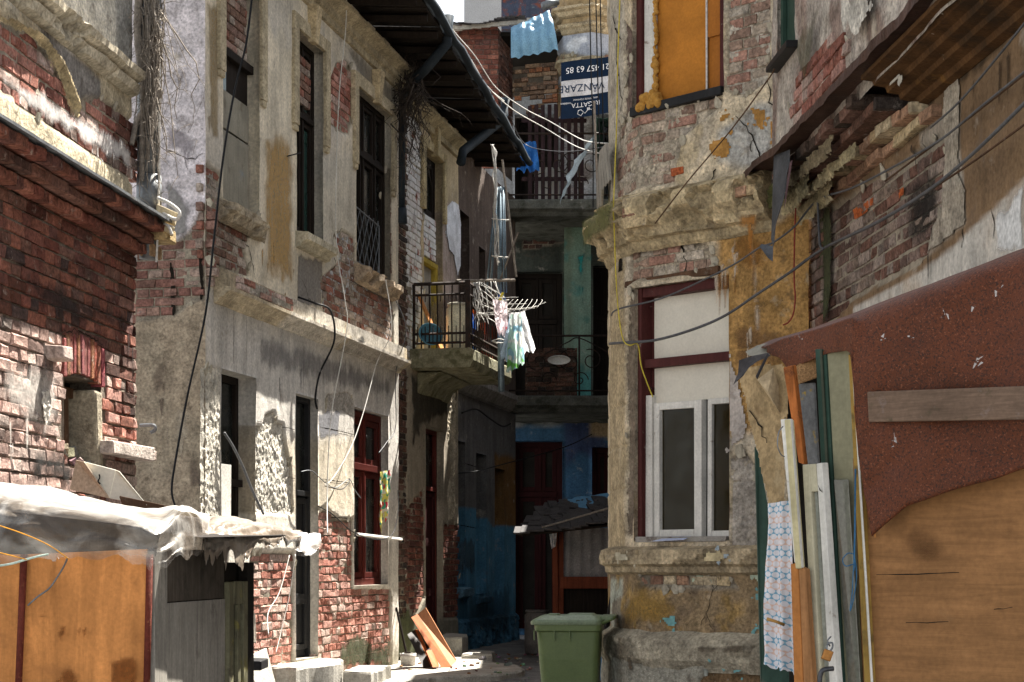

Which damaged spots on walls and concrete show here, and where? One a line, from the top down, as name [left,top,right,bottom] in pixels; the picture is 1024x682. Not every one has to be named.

flaking render [331,60,353,133]
flaking render [616,0,772,229]
crack [736,116,760,156]
flaking render [787,0,873,125]
flaking render [136,164,293,316]
flaking render [808,79,965,329]
flaking render [310,114,426,671]
flaking render [250,547,297,666]
peeling [660,616,676,632]